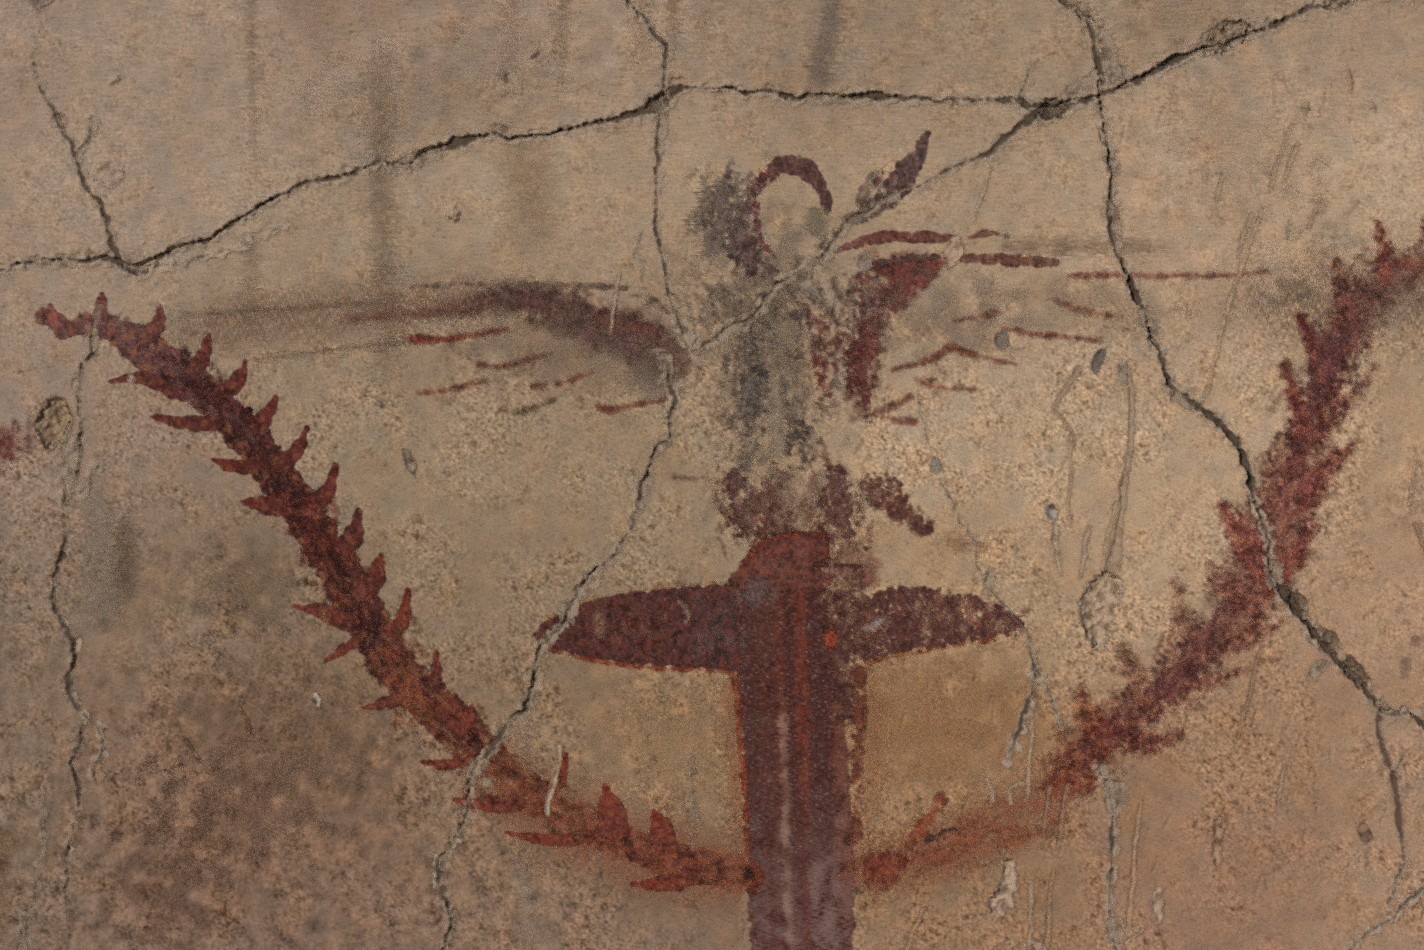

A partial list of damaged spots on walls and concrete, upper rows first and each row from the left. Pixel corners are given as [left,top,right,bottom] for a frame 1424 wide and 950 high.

crack [0,0,1098,362]
crack [18,304,114,950]
crack [431,351,681,950]
crack [916,396,1064,767]
spalling [1077,570,1124,653]
crack [1058,0,1424,905]
crack [1093,765,1127,950]
crack [1343,884,1424,950]